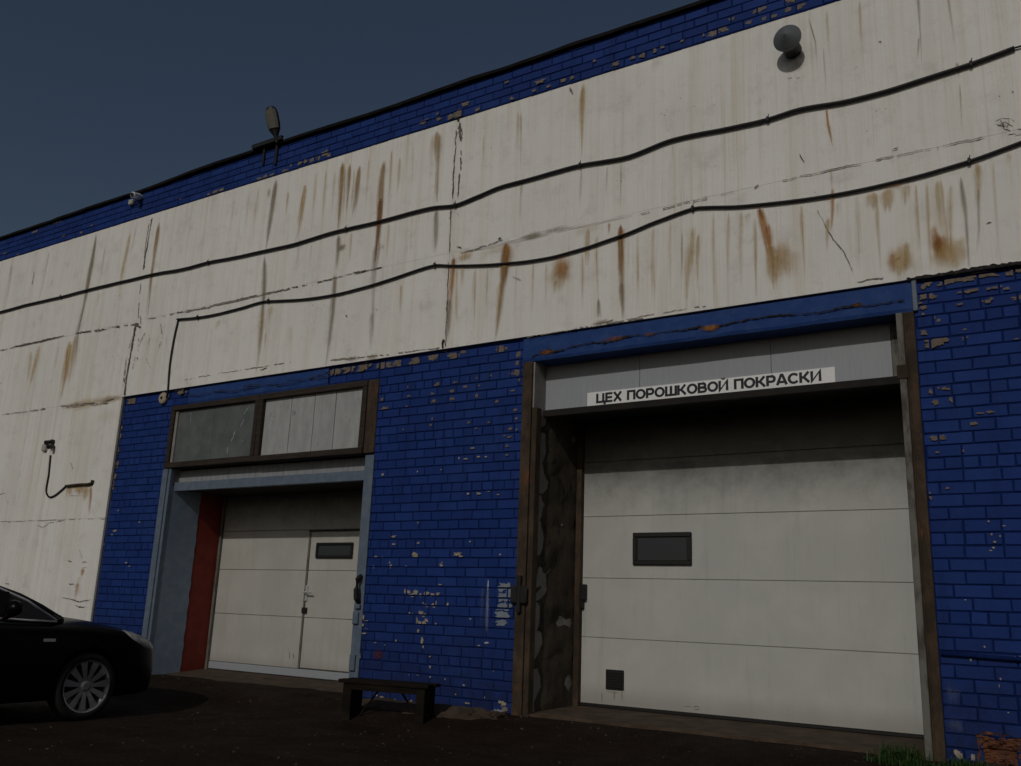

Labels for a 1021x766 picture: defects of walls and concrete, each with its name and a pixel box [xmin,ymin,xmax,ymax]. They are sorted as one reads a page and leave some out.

peeling [745,0,806,24]
rust [338,164,360,221]
rust [759,209,774,276]
rust [934,236,957,260]
rust [496,243,509,328]
peeling [918,269,1021,322]
peeling [921,330,949,348]
peeling [329,350,466,375]
peeling [495,345,521,391]
peeling [488,580,513,626]
peeling [404,584,449,678]
spalling [953,732,1021,766]